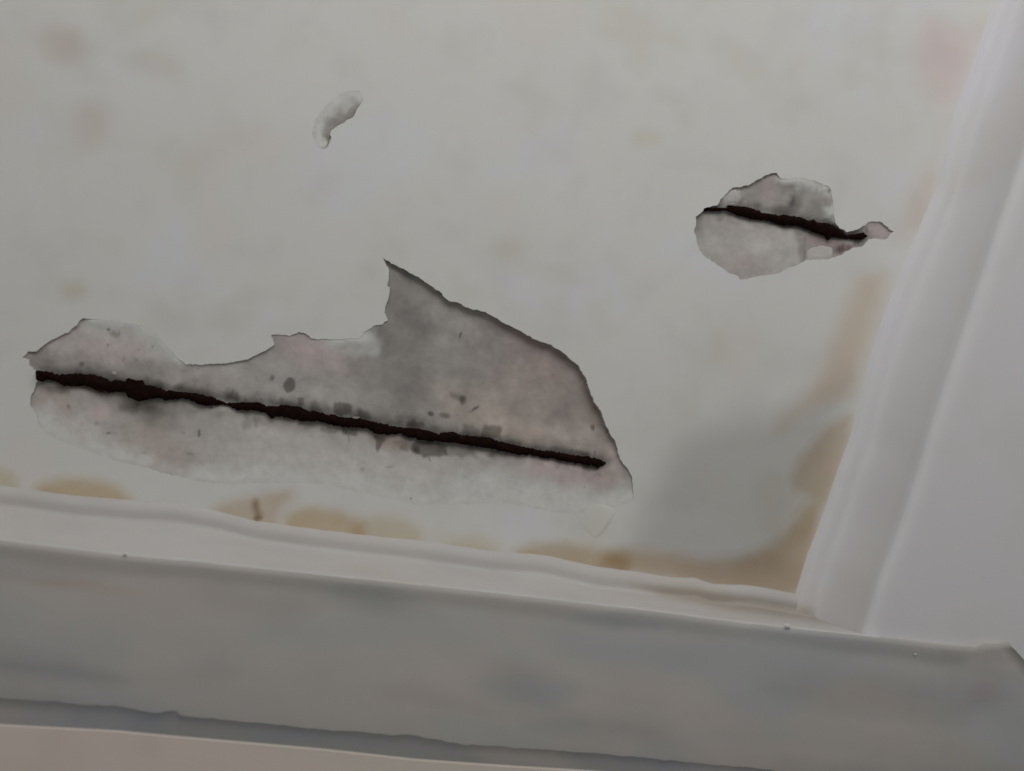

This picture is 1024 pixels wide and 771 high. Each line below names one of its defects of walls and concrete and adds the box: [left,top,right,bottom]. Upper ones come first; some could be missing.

peeling [312,90,364,149]
spalling [694,173,894,280]
spalling [23,258,634,513]